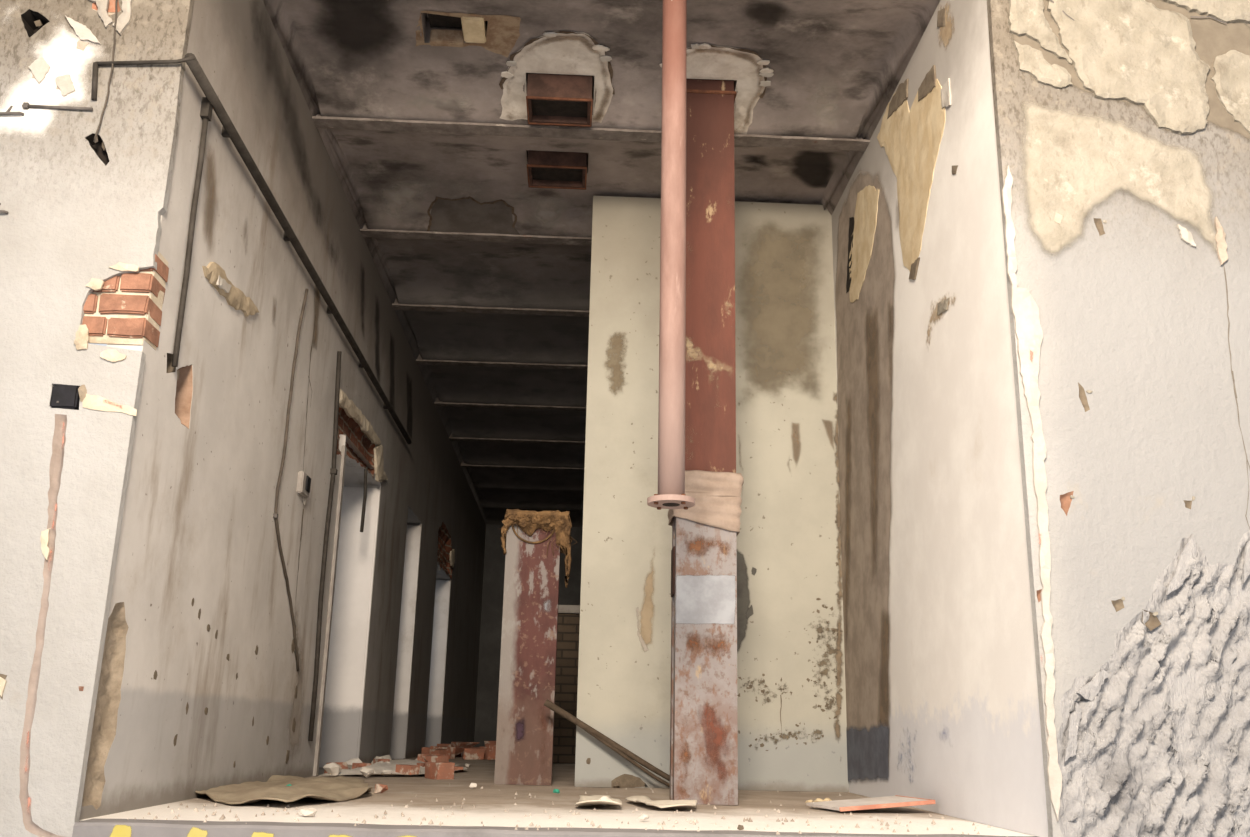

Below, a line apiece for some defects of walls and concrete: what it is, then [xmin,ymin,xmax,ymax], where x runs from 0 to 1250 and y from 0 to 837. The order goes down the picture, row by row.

peeling [0,0,133,134]
damp [748,4,785,24]
peeling [877,65,951,280]
flaking render [74,251,193,429]
damp [743,226,816,390]
damp [792,424,800,461]
flaking render [1002,0,1250,837]
crack [1224,267,1250,528]
rust [686,538,727,555]
rust [687,636,726,655]
damp [737,550,757,652]
rust [702,707,727,778]